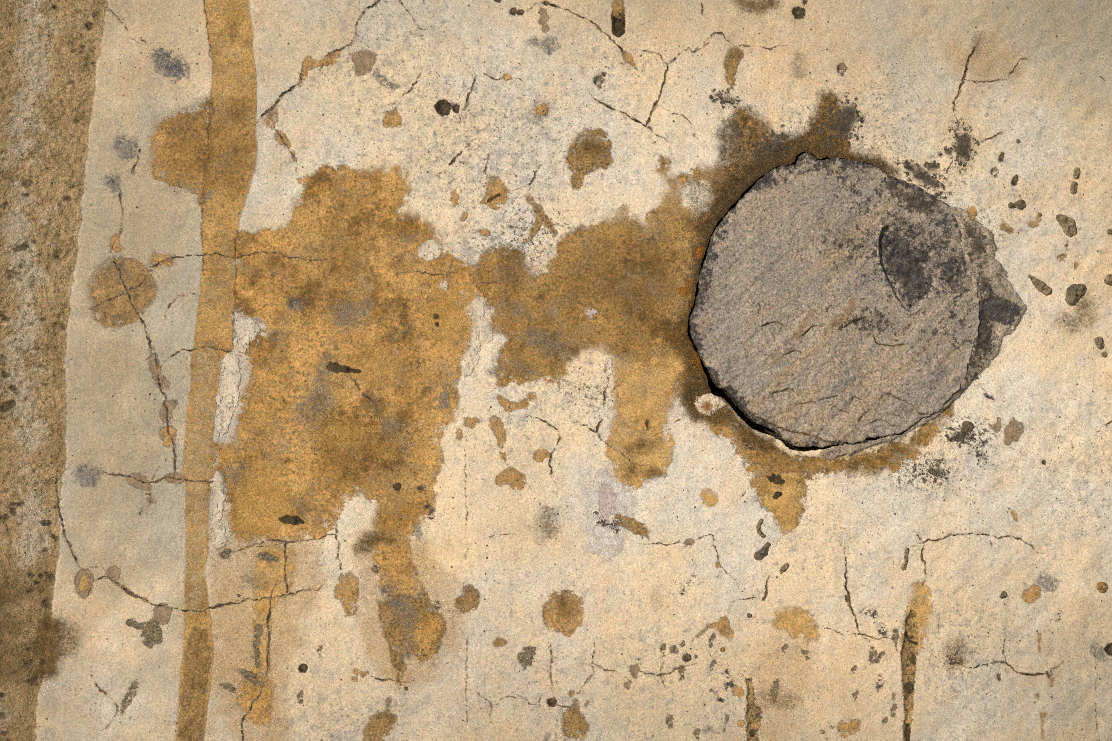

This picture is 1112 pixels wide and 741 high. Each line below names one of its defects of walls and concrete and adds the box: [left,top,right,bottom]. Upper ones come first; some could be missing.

crack [243,0,431,171]
crack [435,72,522,187]
crack [526,2,779,140]
crack [946,131,1003,174]
crack [952,32,1028,117]
crack [88,106,328,515]
crack [54,460,343,741]
spalling [900,581,933,741]
crack [826,556,1063,679]
crack [908,532,1038,586]